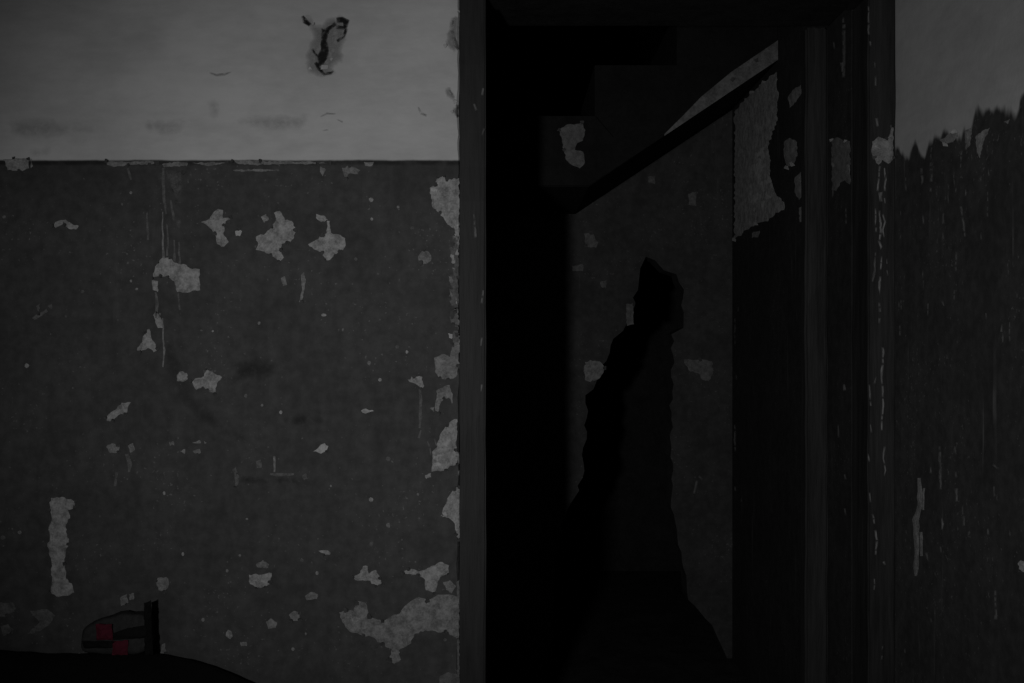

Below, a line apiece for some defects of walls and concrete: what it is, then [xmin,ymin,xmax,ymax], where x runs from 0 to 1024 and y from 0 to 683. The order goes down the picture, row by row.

peeling [557,121,585,168]
peeling [730,46,801,242]
peeling [930,128,989,167]
peeling [104,159,374,367]
peeling [177,368,222,396]
flaking render [408,174,460,542]
peeling [46,497,78,597]
peeling [249,560,273,589]
peeling [339,562,460,683]